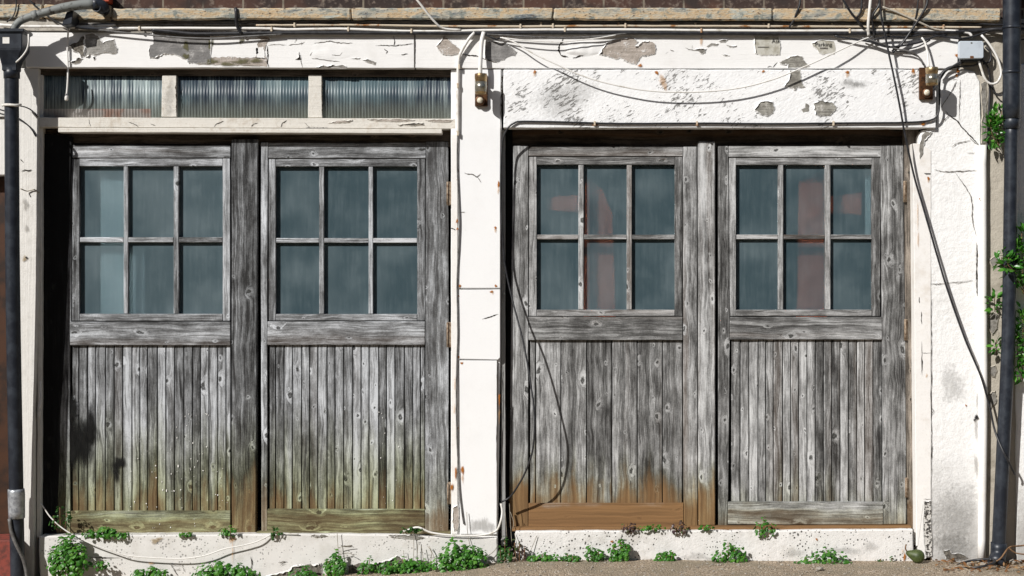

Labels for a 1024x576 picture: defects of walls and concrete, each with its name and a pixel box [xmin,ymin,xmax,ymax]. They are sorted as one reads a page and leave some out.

peeling [69,32,118,65]
peeling [148,30,271,67]
peeling [436,35,517,62]
peeling [599,37,657,65]
peeling [753,36,810,91]
peeling [754,100,775,117]
peeling [801,100,838,117]
crack [919,169,978,505]